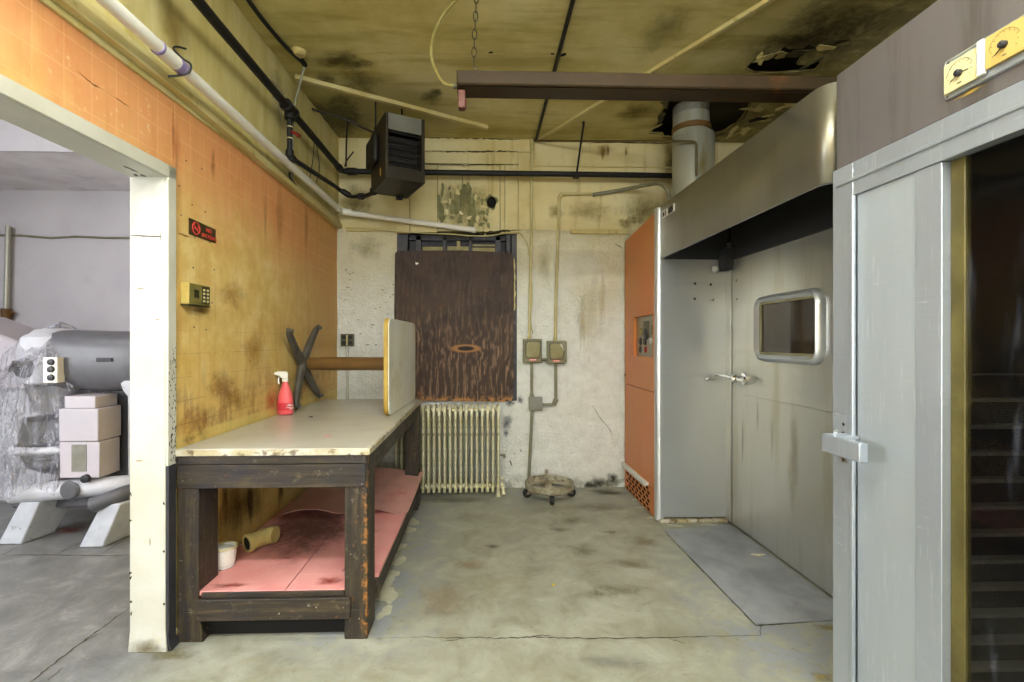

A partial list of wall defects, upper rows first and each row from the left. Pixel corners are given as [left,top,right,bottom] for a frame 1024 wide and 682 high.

peeling [752,51,787,65]
peeling [715,103,797,140]
peeling [426,138,520,235]
leakage [585,475,618,494]
crack [391,634,707,642]